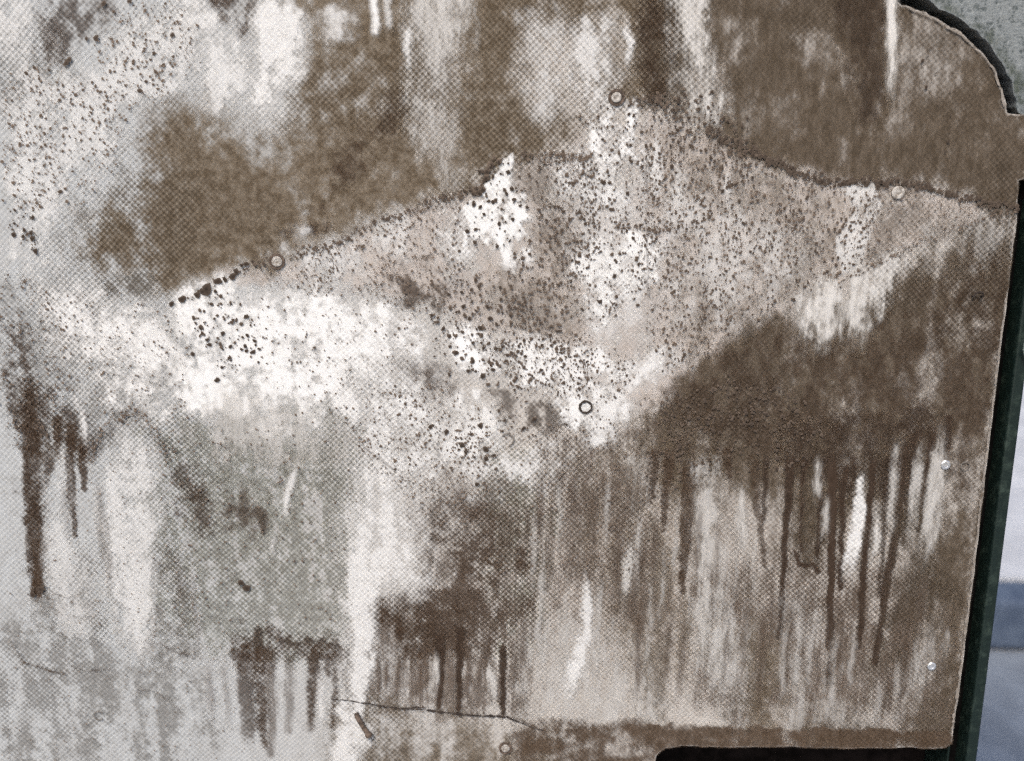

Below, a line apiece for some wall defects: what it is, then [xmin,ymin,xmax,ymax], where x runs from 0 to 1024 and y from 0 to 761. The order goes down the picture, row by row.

leakage [0,593,92,761]
crack [331,699,543,731]